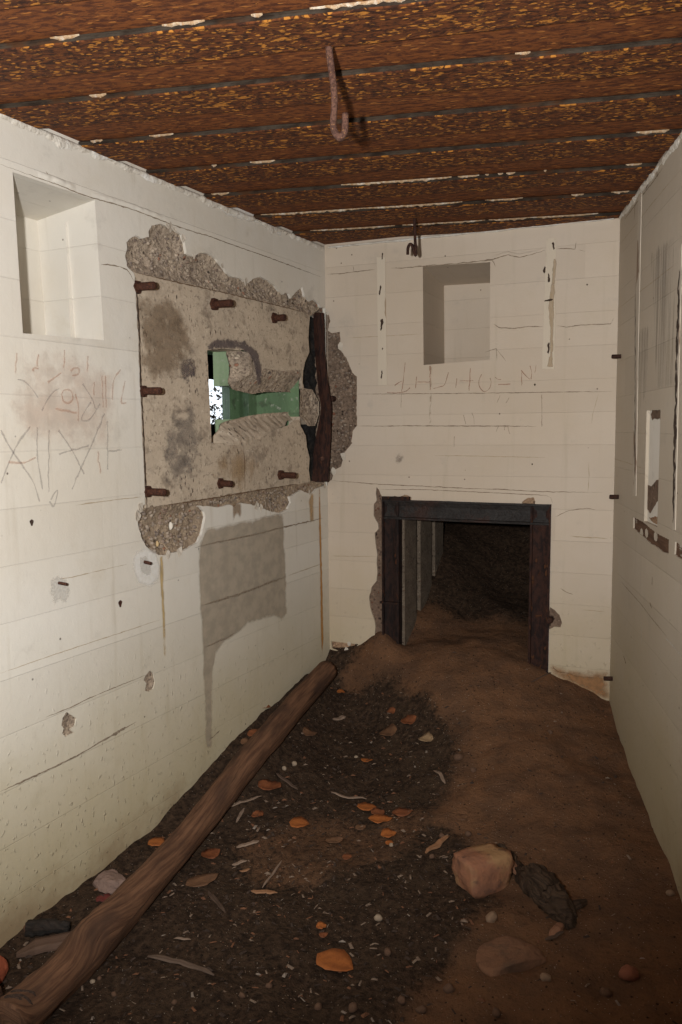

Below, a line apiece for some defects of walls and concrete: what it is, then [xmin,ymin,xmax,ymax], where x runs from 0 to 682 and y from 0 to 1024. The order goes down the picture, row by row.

peeling [125,222,357,746]
rust [309,490,323,648]
spalling [370,488,382,633]
peeling [62,712,75,736]